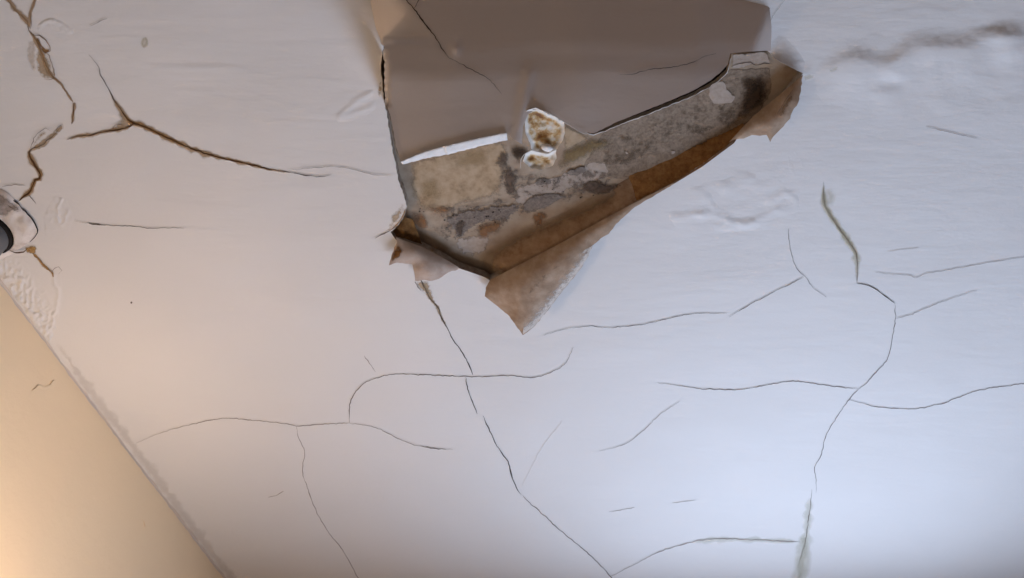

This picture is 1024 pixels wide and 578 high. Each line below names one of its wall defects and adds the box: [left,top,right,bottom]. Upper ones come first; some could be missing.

crack [80,221,176,229]
crack [2,0,387,208]
peeling [389,237,459,281]
flaking render [412,142,506,210]
flaking render [457,235,492,256]
water stain [413,134,651,239]
flaking render [515,52,803,204]
crack [140,183,1023,578]